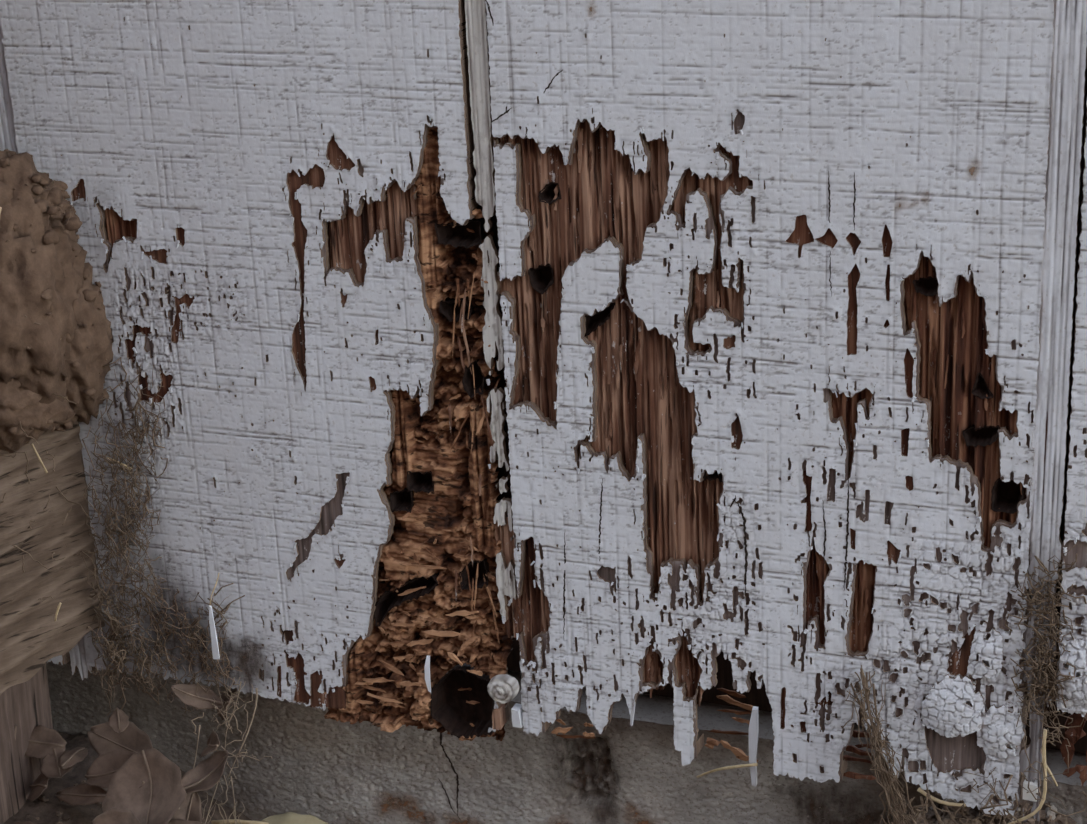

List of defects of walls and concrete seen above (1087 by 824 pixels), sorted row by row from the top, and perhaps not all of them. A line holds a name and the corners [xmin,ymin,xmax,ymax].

peeling [101,207,185,263]
peeling [126,322,173,404]
peeling [170,294,195,343]
spalling [278,120,753,741]
peeling [786,215,861,354]
peeling [826,388,873,501]
peeling [882,224,1017,548]
peeling [803,470,830,644]
peeling [816,691,833,707]